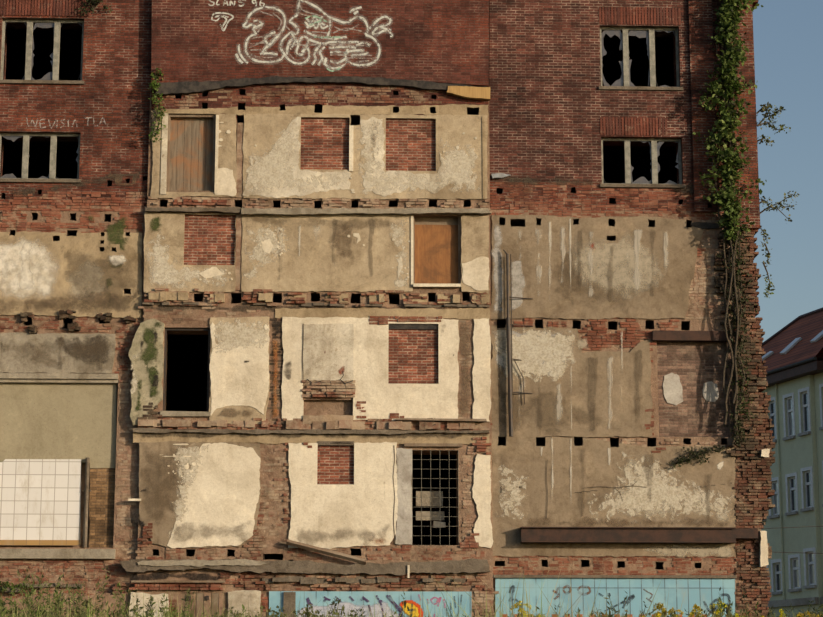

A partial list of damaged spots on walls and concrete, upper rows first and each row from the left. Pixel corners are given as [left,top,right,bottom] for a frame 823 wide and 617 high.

flaking render [156,85,447,109]
flaking render [0,191,158,235]
water stain [0,240,121,308]
water stain [110,256,126,265]
flaking render [168,117,731,382]
water stain [561,219,668,296]
flaking render [0,223,741,617]